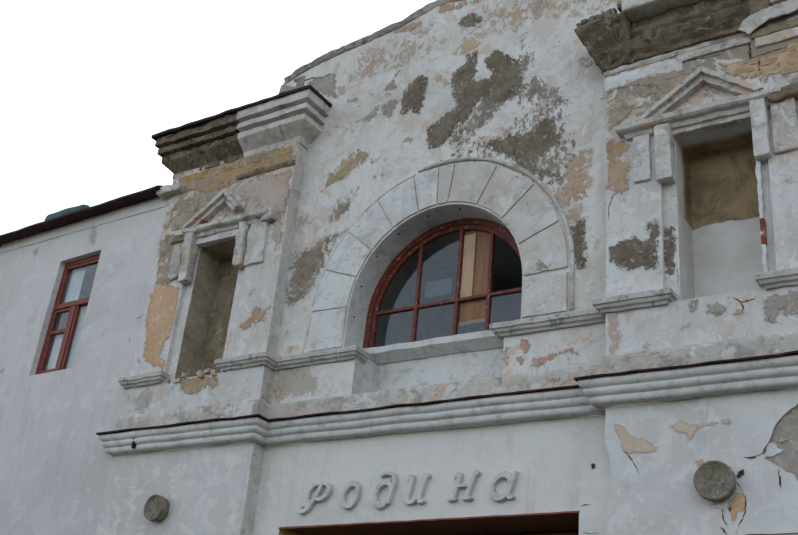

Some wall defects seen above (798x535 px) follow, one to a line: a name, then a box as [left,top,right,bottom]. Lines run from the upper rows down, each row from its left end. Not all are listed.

spalling [307,0,622,149]
flaking render [725,42,798,84]
spalling [606,63,699,194]
spalling [321,149,378,191]
spalling [487,118,593,270]
flaking render [143,146,294,394]
spalling [689,299,742,318]
spalling [761,290,798,324]
peeling [615,424,657,455]
peeling [670,418,731,440]
spalling [744,404,798,480]
peeling [730,493,746,521]